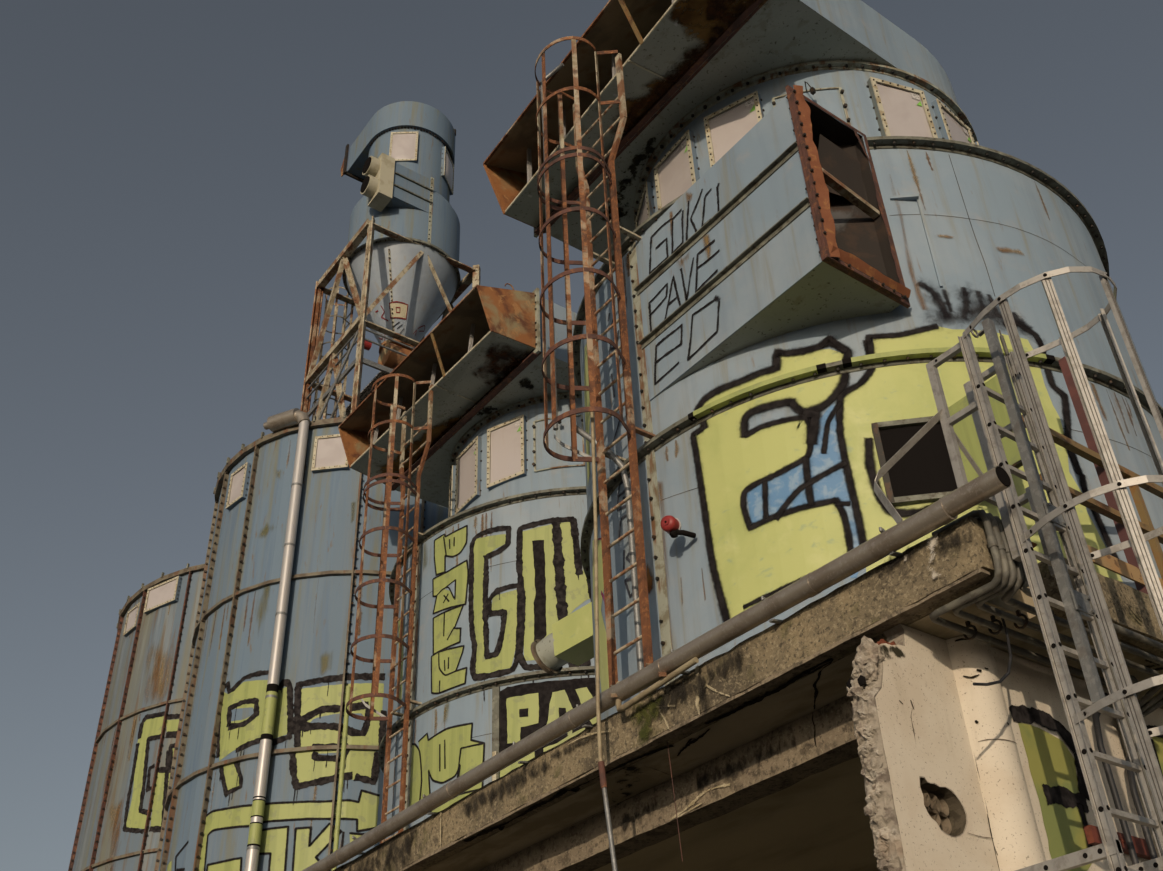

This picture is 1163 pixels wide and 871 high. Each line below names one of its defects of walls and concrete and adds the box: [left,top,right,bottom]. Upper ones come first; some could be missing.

corrosion [611,0,766,136]
leakage [658,650,742,729]
crack [801,660,833,747]
leakage [612,767,657,831]
leakage [696,738,796,791]
spalling [846,636,905,871]
spalling [919,776,968,837]